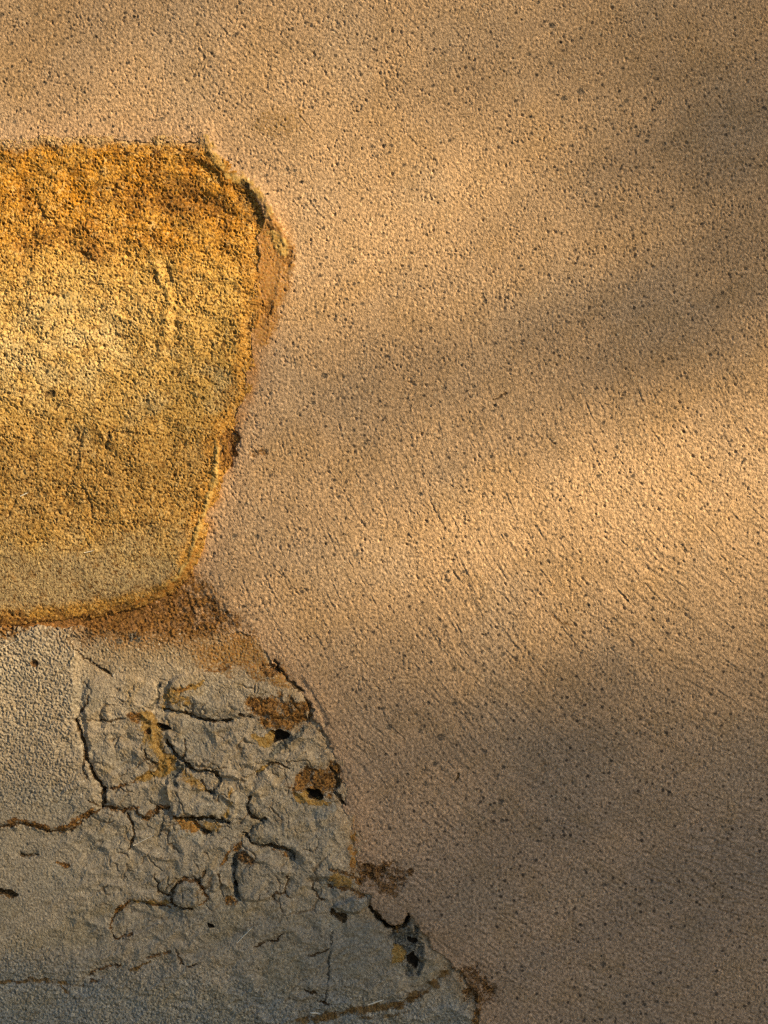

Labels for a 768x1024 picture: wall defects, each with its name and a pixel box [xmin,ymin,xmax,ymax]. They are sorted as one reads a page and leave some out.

flaking render [237,179,295,345]
spalling [219,428,241,468]
peeling [127,710,167,758]
spalling [245,692,312,759]
crack [0,637,325,940]
spalling [285,760,346,819]
crack [304,932,333,1006]
spalling [318,894,425,976]